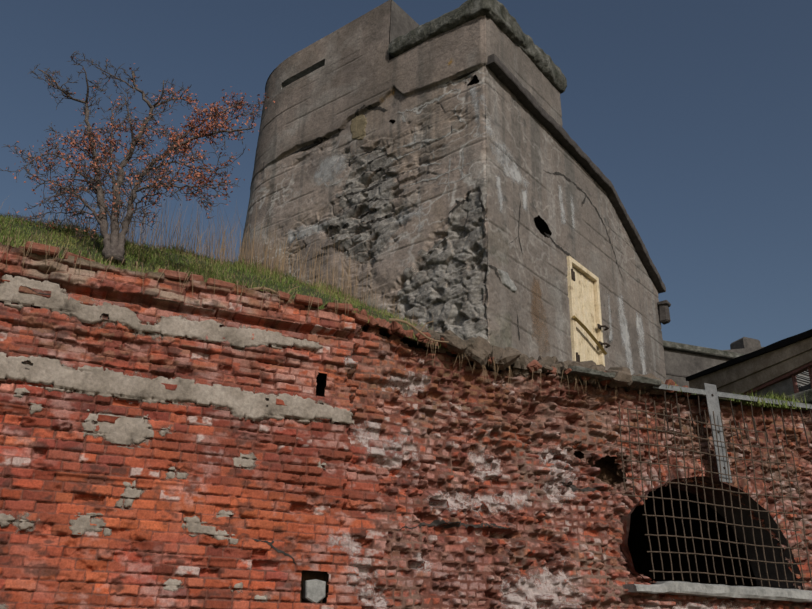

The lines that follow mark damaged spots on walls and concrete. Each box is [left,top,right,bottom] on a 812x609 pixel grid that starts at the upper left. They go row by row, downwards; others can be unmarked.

crack [306,89,486,232]
crack [544,170,624,281]
spalling [572,446,628,485]